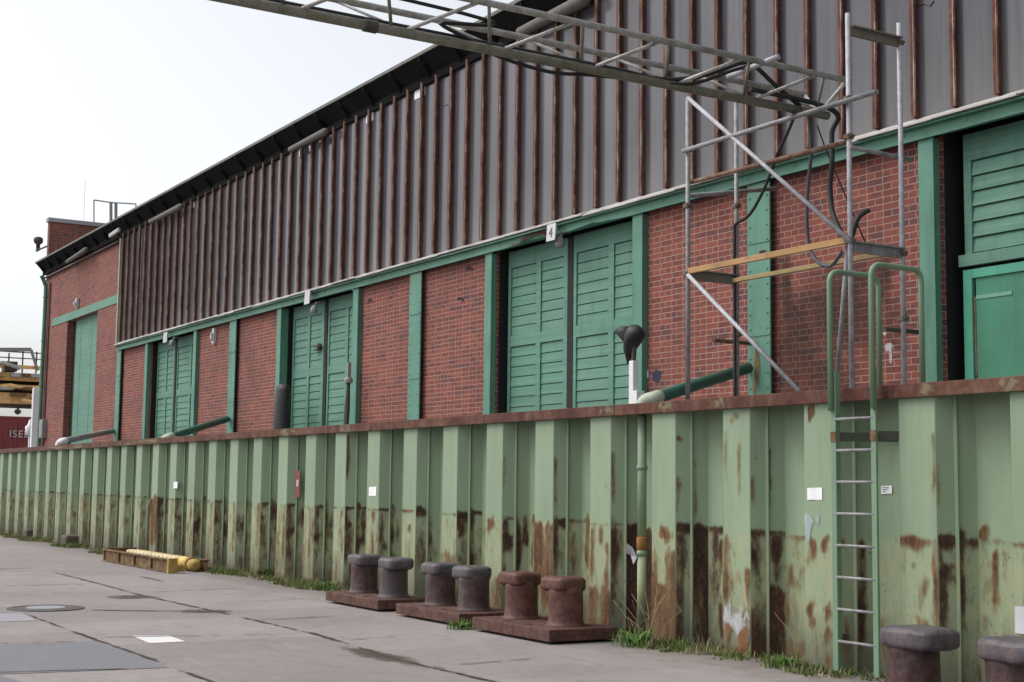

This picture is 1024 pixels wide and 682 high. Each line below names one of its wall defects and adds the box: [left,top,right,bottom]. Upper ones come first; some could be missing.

rust [2,489,845,666]
peeling [723,600,750,651]
rust [843,540,868,653]
rust [900,525,1024,627]